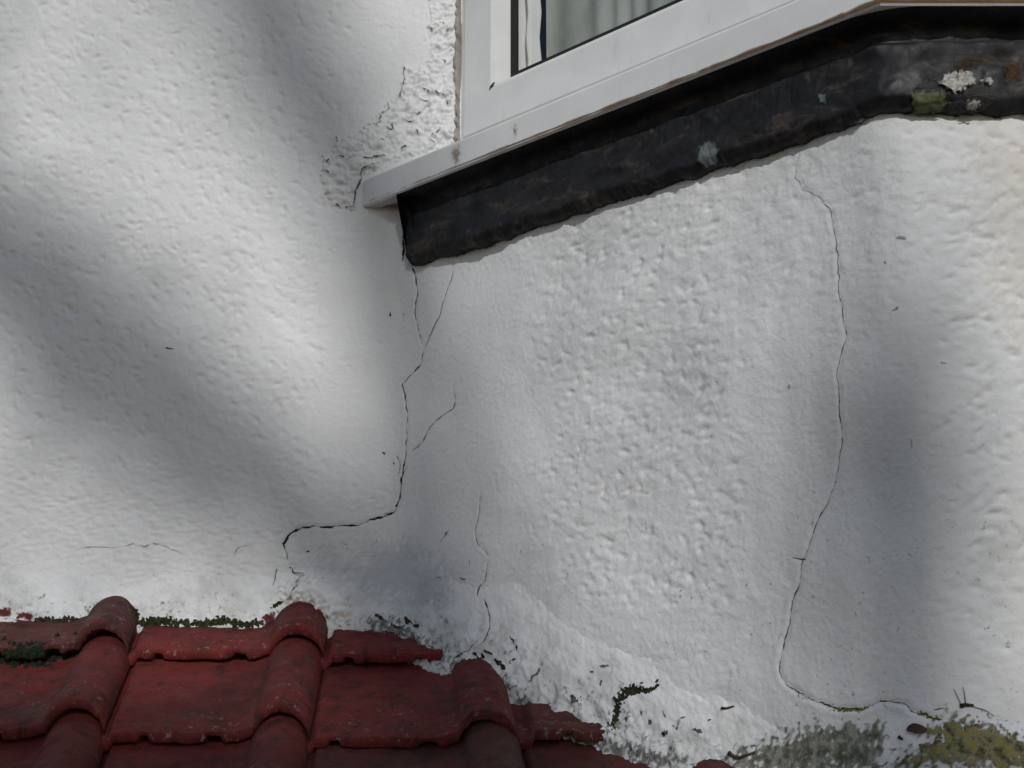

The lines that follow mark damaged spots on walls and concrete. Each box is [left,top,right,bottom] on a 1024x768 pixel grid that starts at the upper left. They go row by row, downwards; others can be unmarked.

crack [335,162,378,207]
crack [273,235,456,599]
crack [454,505,490,659]
crack [779,154,943,721]